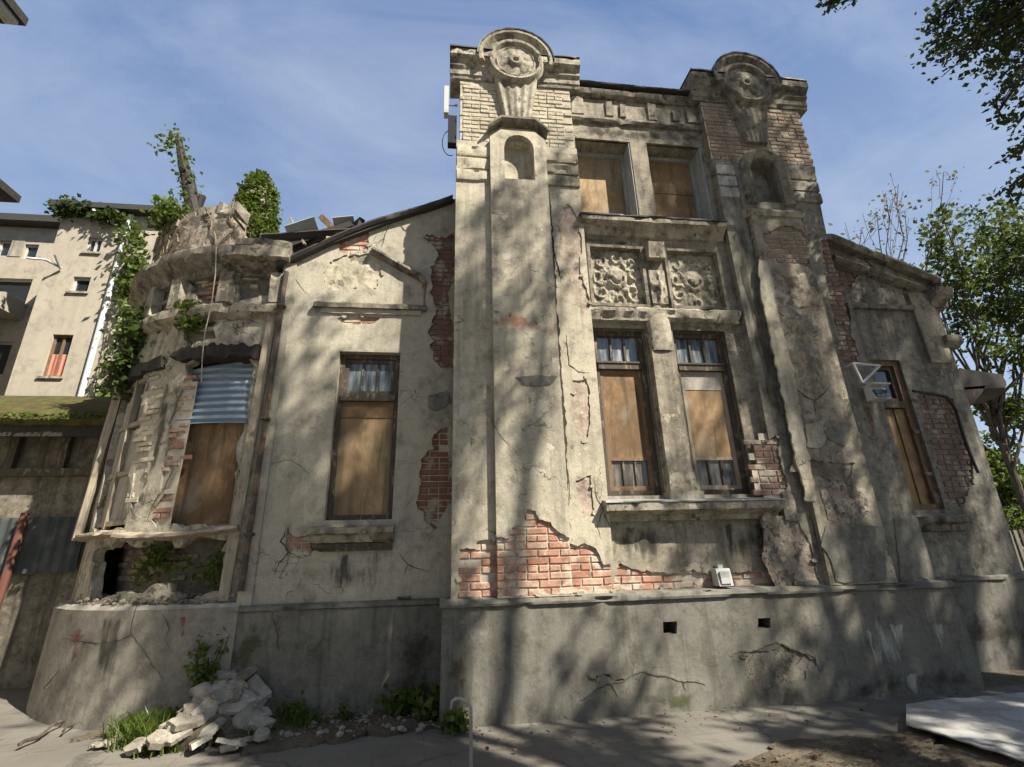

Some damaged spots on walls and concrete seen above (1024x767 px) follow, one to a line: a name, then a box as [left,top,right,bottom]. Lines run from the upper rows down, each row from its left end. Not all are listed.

peeling [324,234,383,291]
spalling [423,234,455,370]
spalling [751,226,871,365]
crack [532,189,612,539]
spalling [416,428,452,529]
spalling [742,433,798,498]
crack [274,530,302,574]
spalling [455,509,819,599]
crack [64,606,173,680]
crack [633,667,706,691]
crack [729,639,822,670]